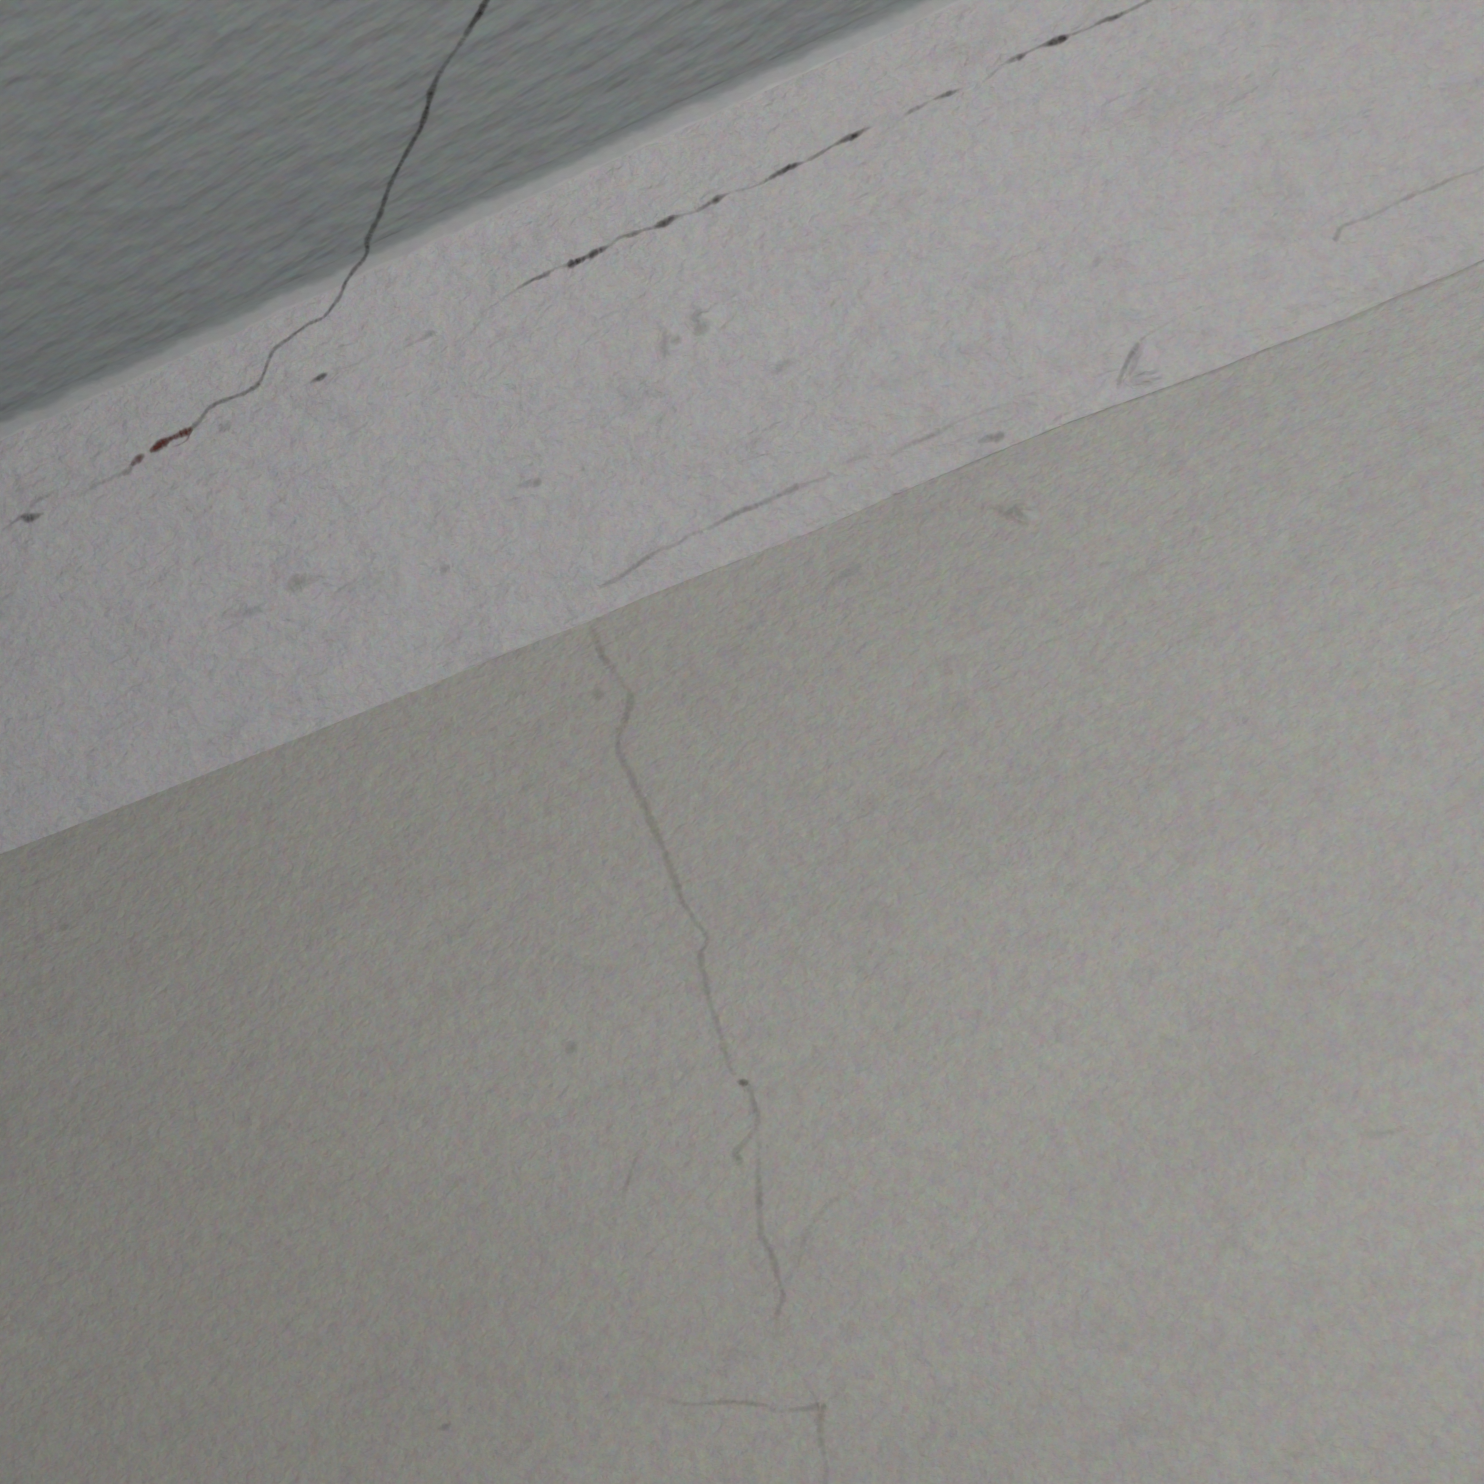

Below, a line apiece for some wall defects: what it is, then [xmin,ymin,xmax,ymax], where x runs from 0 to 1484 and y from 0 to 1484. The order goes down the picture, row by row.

crack [470,0,487,27]
crack [1020,36,1066,57]
crack [345,85,435,284]
crack [658,217,674,226]
crack [568,248,602,267]
crack [133,428,192,463]